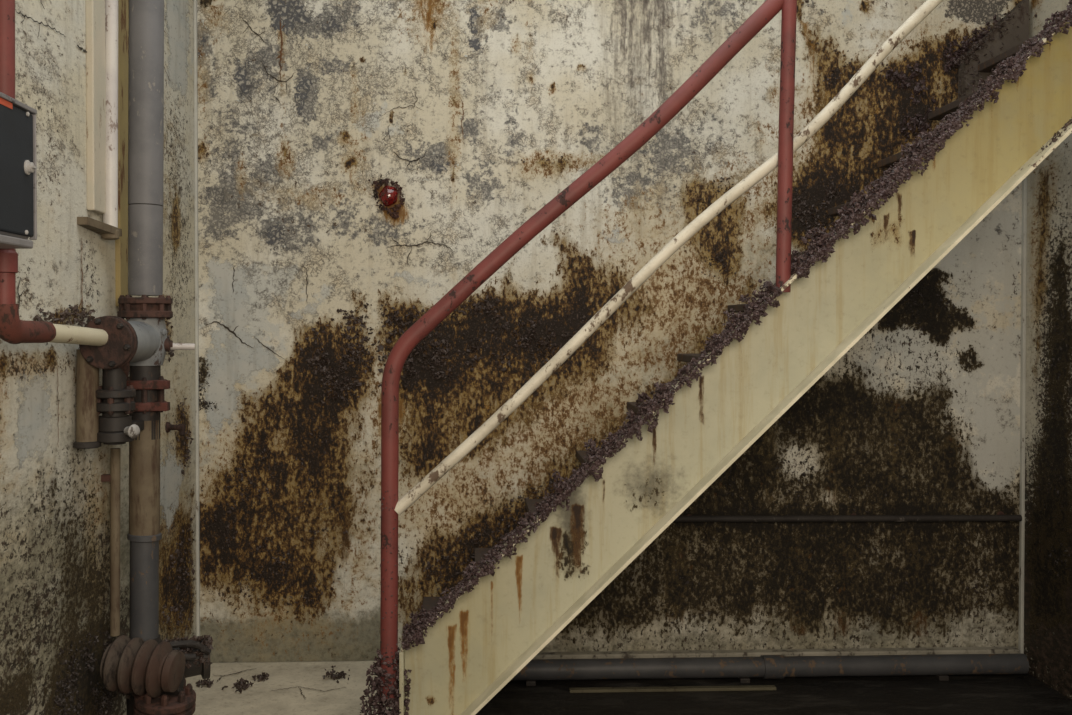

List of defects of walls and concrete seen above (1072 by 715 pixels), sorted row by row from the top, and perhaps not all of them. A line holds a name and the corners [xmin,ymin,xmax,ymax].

corrosion [791,0,1012,252]
corrosion [0,345,58,393]
mould [0,466,117,715]
crack [206,321,286,360]
corrosion [200,289,433,624]
corrosion [398,413,636,641]
corrosion [399,228,656,482]
mould [555,237,1072,649]